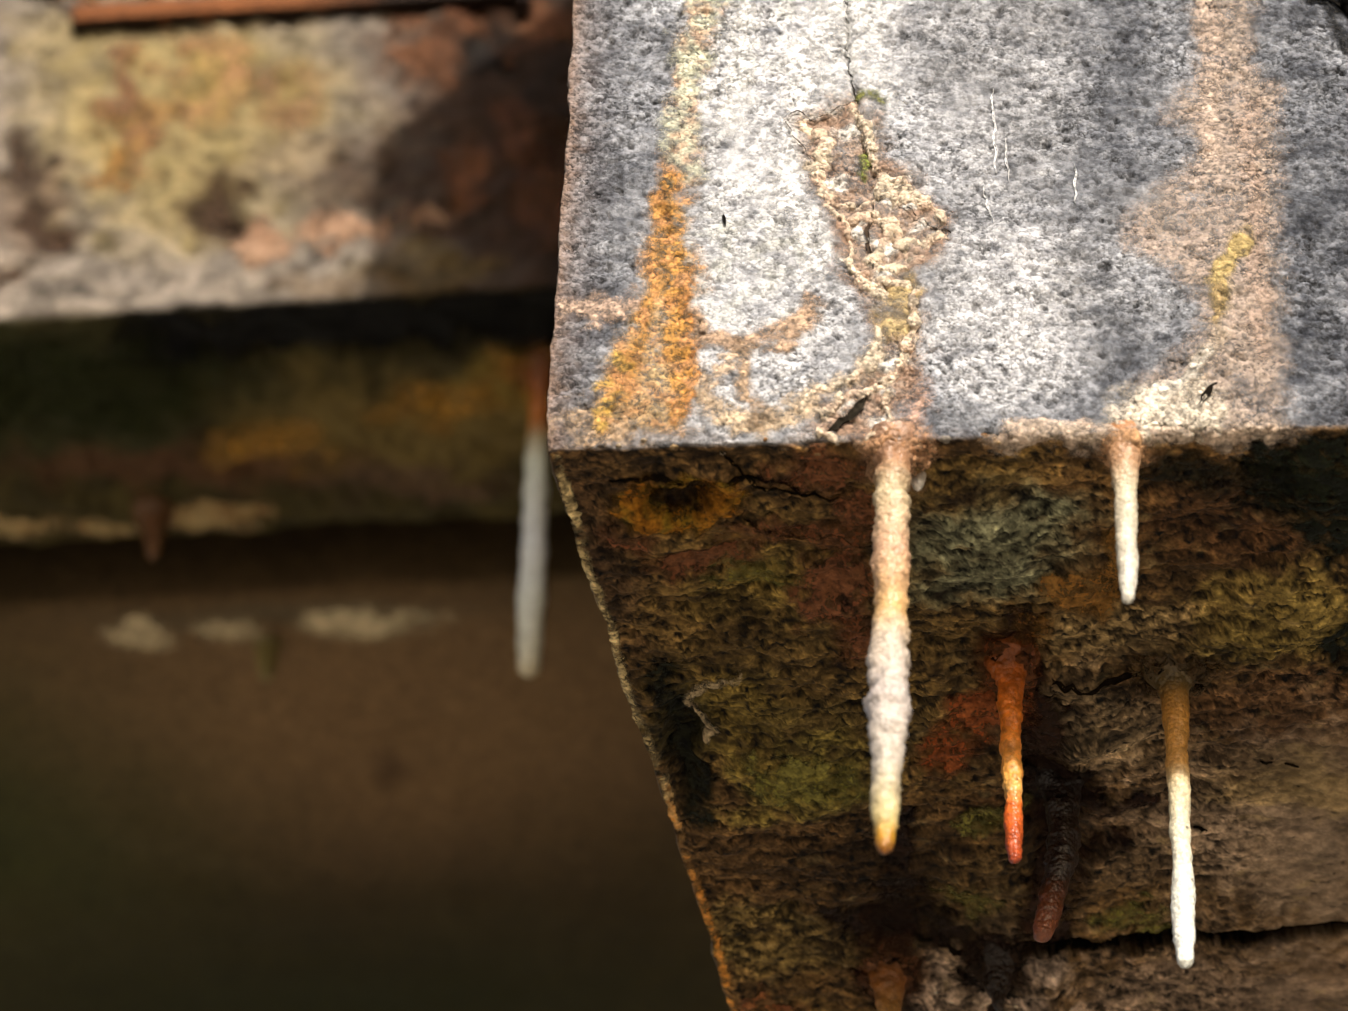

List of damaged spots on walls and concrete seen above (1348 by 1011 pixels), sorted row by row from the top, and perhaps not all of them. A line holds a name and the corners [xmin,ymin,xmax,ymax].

crack [783,0,878,179]
crack [1307,0,1348,54]
rust [593,163,705,433]
crack [902,204,951,233]
leakage [998,345,1348,572]
rust [602,443,876,663]
rust [916,689,1000,776]
rust [997,526,1122,767]
leakage [1307,623,1348,676]
crack [879,924,972,956]
rust [818,791,1161,967]
crack [1022,921,1348,958]